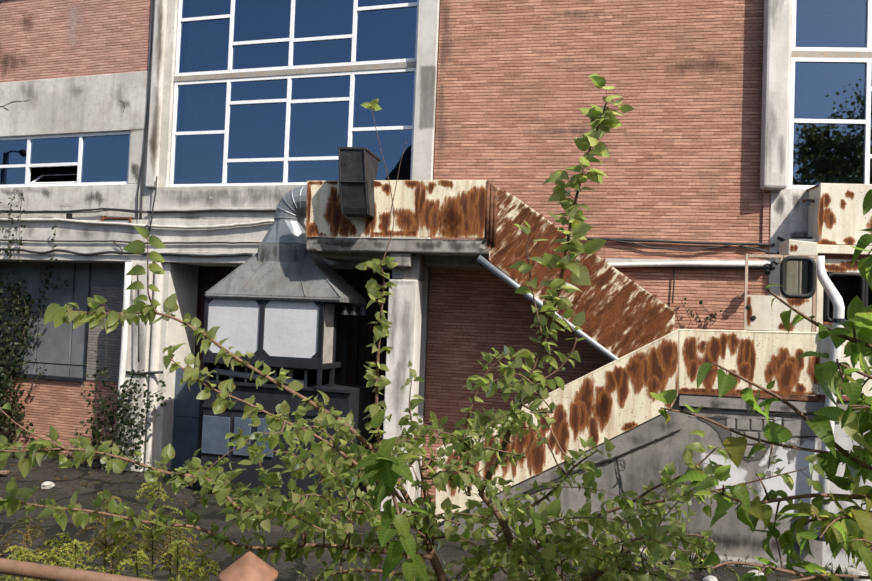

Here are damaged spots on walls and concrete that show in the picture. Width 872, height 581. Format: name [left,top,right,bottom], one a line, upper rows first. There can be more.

rust [306,180,820,496]
rust [817,190,855,246]